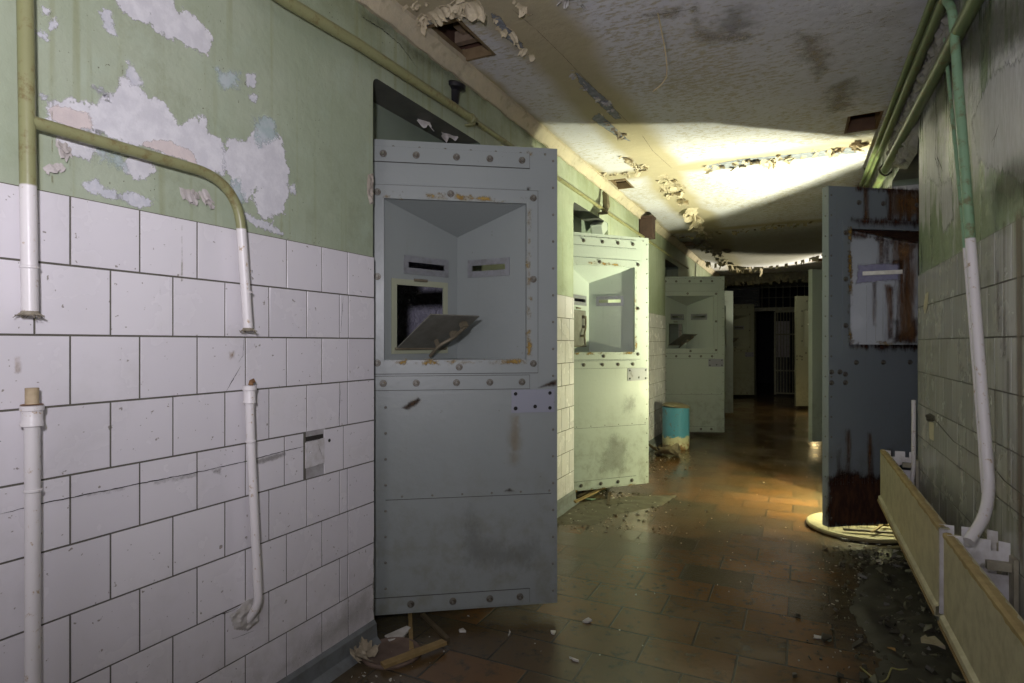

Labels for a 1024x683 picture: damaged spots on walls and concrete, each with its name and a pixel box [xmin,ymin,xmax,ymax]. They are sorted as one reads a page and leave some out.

peeling [35,5,58,42]
peeling [98,0,213,57]
peeling [402,0,535,64]
peeling [39,61,296,235]
peeling [704,140,871,174]
peeling [599,156,822,287]
corrosion [848,184,919,351]
corrosion [826,430,888,528]